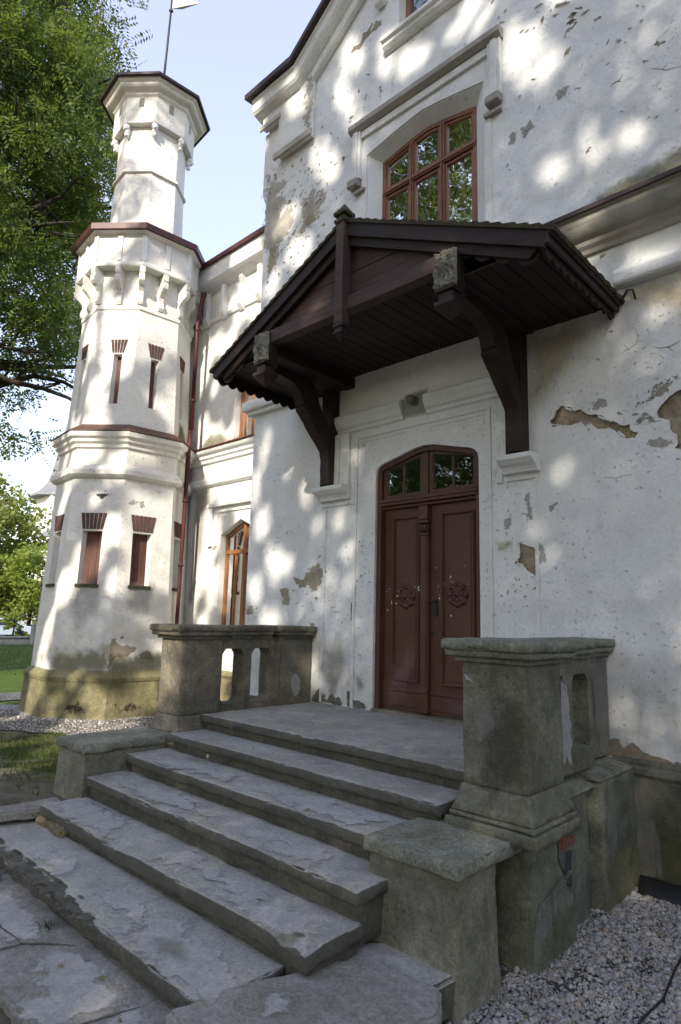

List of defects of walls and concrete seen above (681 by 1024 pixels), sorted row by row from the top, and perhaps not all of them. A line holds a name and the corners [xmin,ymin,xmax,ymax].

peeling [351,20,382,53]
peeling [508,121,535,145]
peeling [260,147,346,284]
spalling [550,375,681,460]
peeling [280,535,328,626]
spalling [505,541,546,592]
peeling [108,636,152,666]
spalling [312,688,366,709]
peeling [0,846,97,930]
peeling [0,894,42,942]